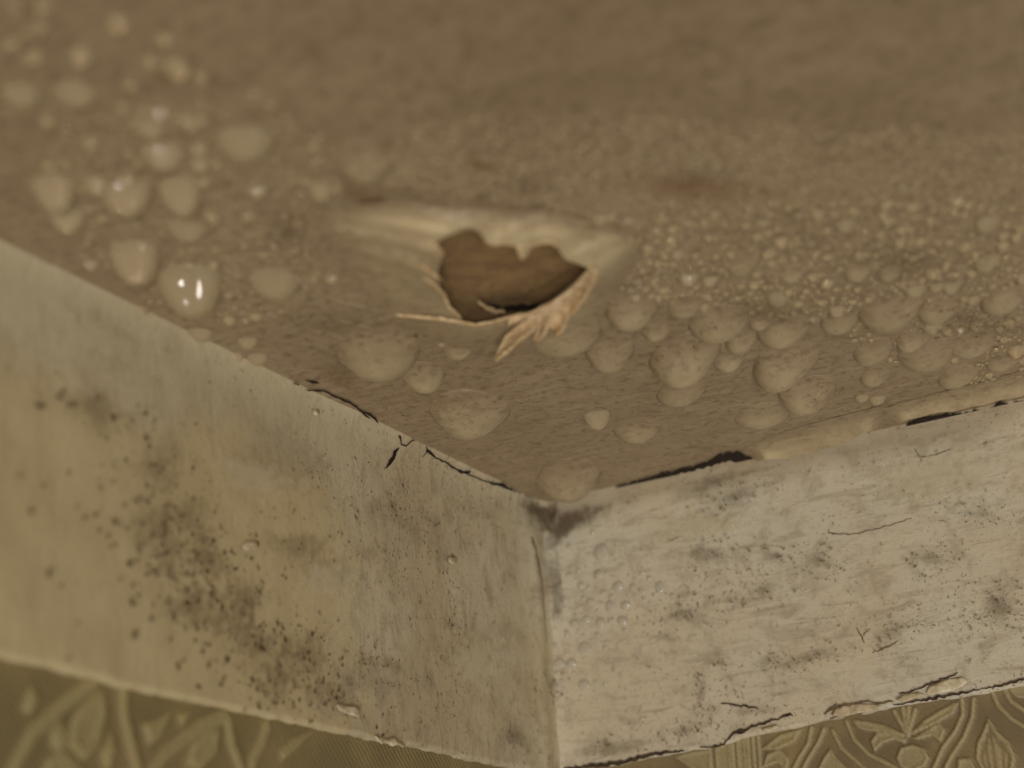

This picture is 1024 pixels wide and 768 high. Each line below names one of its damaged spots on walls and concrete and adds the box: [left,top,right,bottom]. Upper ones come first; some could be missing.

crack [293,380,378,423]
crack [896,401,1020,429]
crack [399,435,534,500]
crack [614,452,752,489]
crack [915,449,951,462]
water stain [524,503,600,543]
crack [828,518,912,535]
mould [76,404,428,736]
mould [688,533,845,610]
peeling [897,677,968,702]
peeling [832,704,882,717]
crack [564,703,793,768]